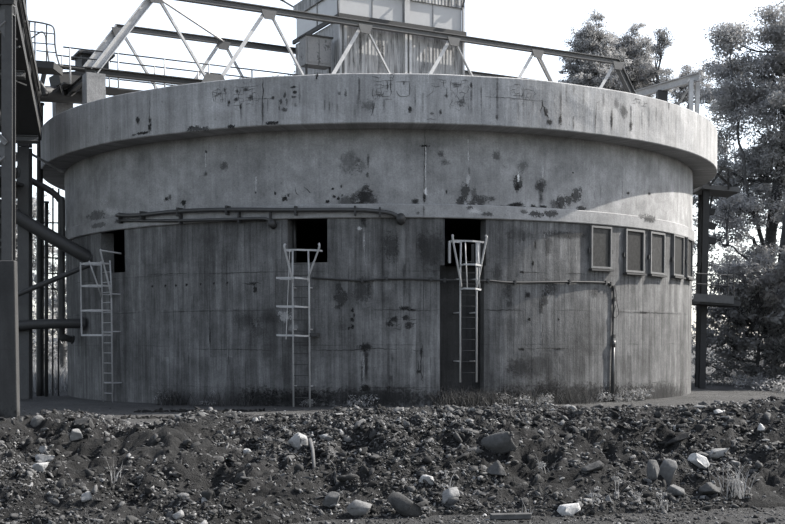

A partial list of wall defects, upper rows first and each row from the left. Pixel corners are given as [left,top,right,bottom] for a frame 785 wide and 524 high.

damp [473,195,496,205]
damp [508,173,547,208]